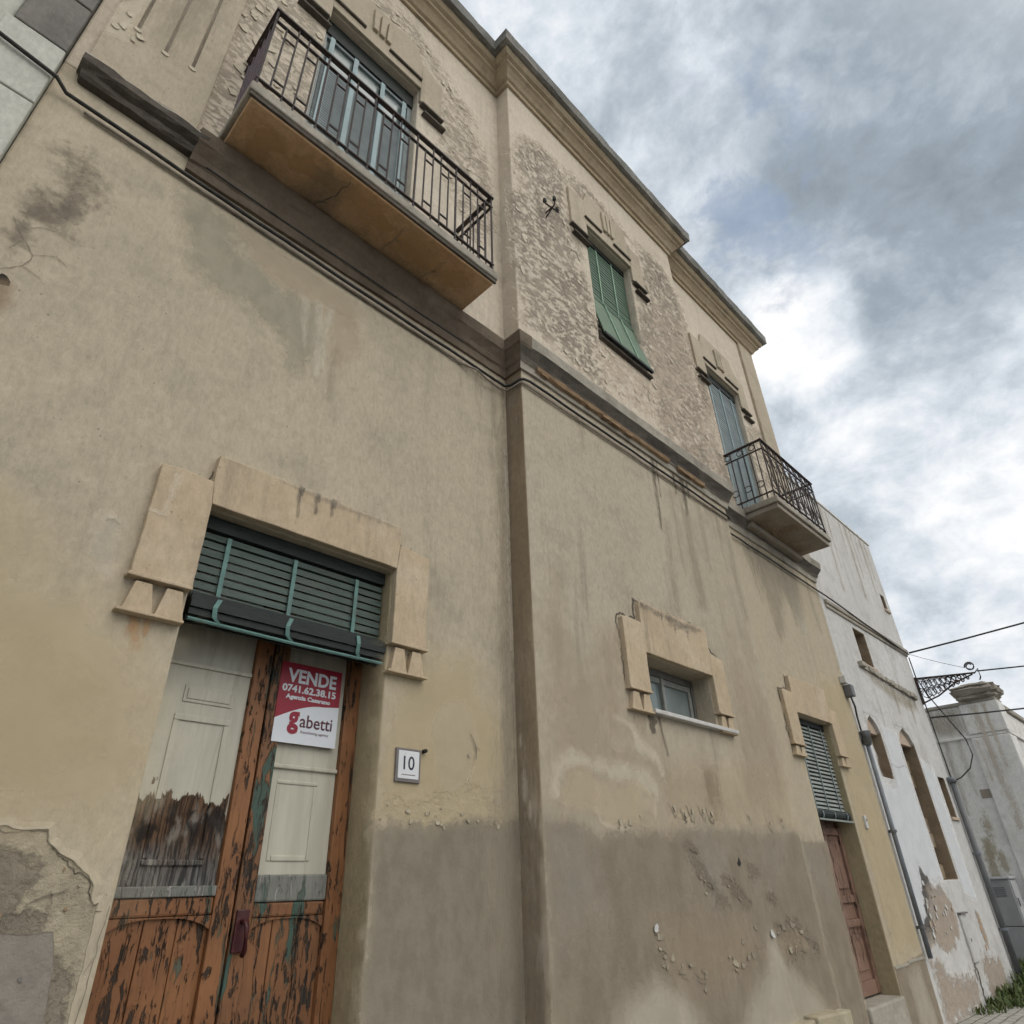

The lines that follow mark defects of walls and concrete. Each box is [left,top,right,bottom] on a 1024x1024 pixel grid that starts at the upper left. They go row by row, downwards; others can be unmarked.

leakage [10,151,99,246]
crack [4,218,67,278]
peeling [373,0,737,503]
leakage [297,486,345,513]
peeling [376,778,508,830]
peeling [870,728,1009,1024]
flaking render [0,817,104,1024]
leakage [626,990,696,1024]
leakage [750,941,823,1024]